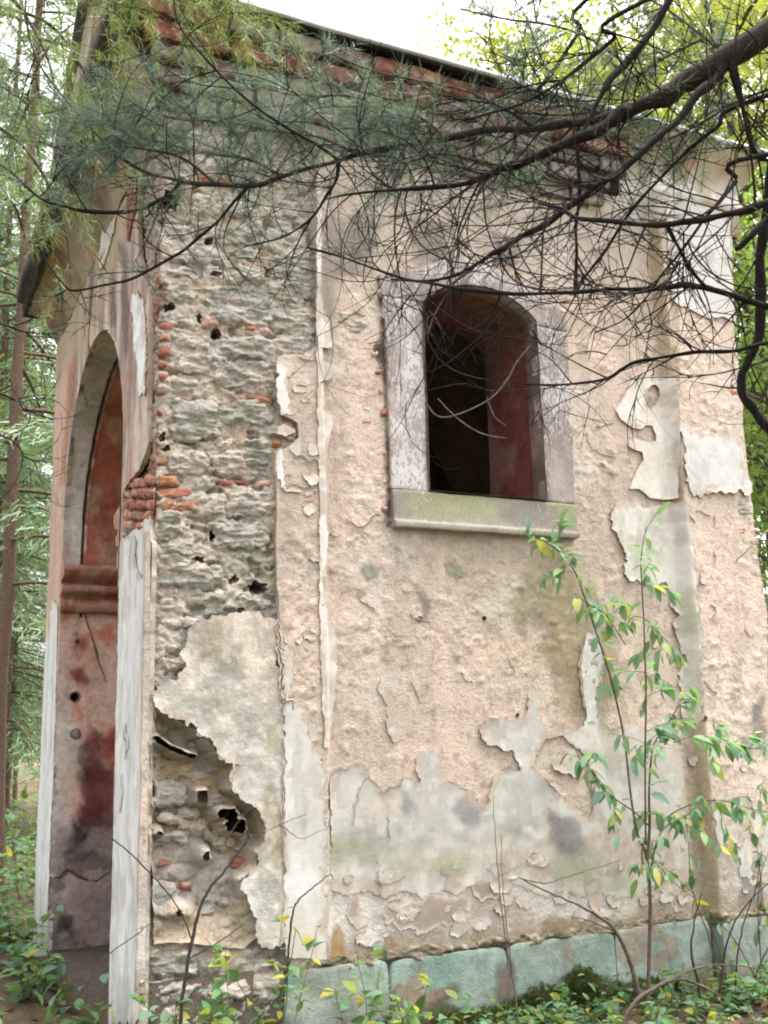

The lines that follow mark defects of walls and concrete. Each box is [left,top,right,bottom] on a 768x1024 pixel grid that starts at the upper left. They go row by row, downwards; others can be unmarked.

flaking render [99,107,698,1024]
flaking render [609,371,759,724]
damp [69,795,102,853]
crack [53,867,110,882]
damp [57,915,72,934]